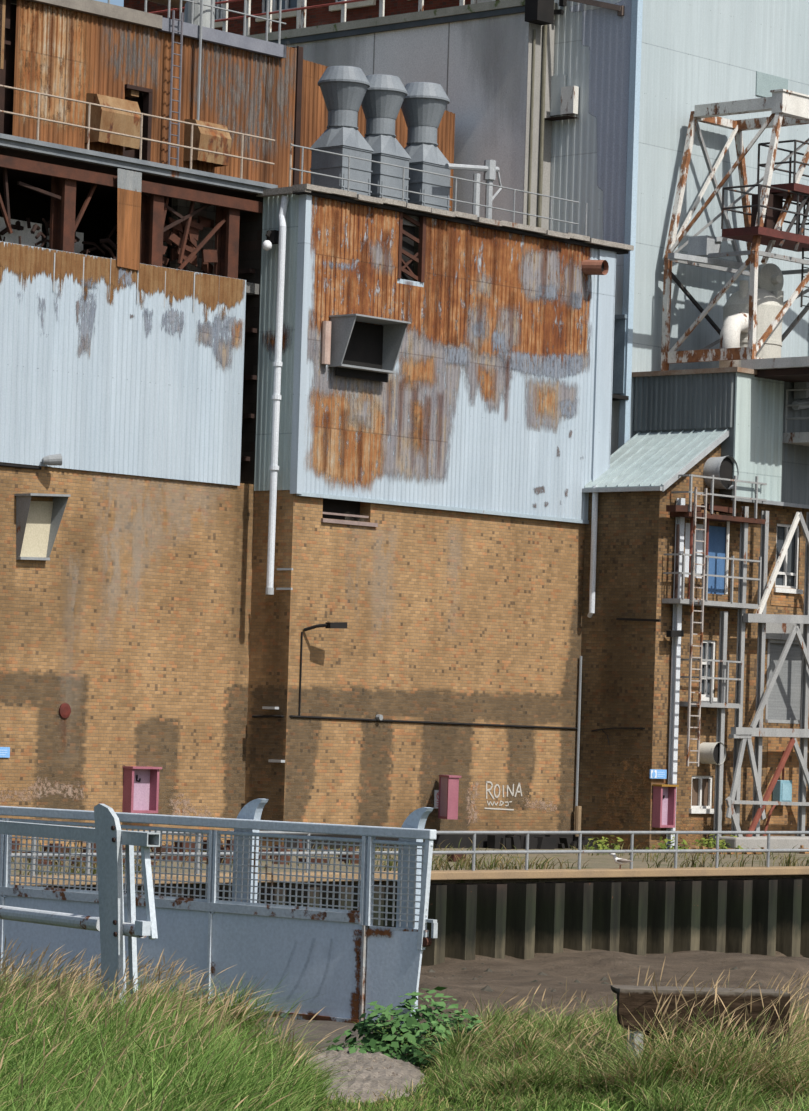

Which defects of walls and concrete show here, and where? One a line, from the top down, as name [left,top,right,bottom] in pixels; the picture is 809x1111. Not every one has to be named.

rust [18,2,92,133]
rust [0,241,245,322]
rust [307,196,590,374]
rust [308,390,385,488]
leakage [0,673,87,822]
leakage [136,564,584,839]
rust [350,928,391,1020]